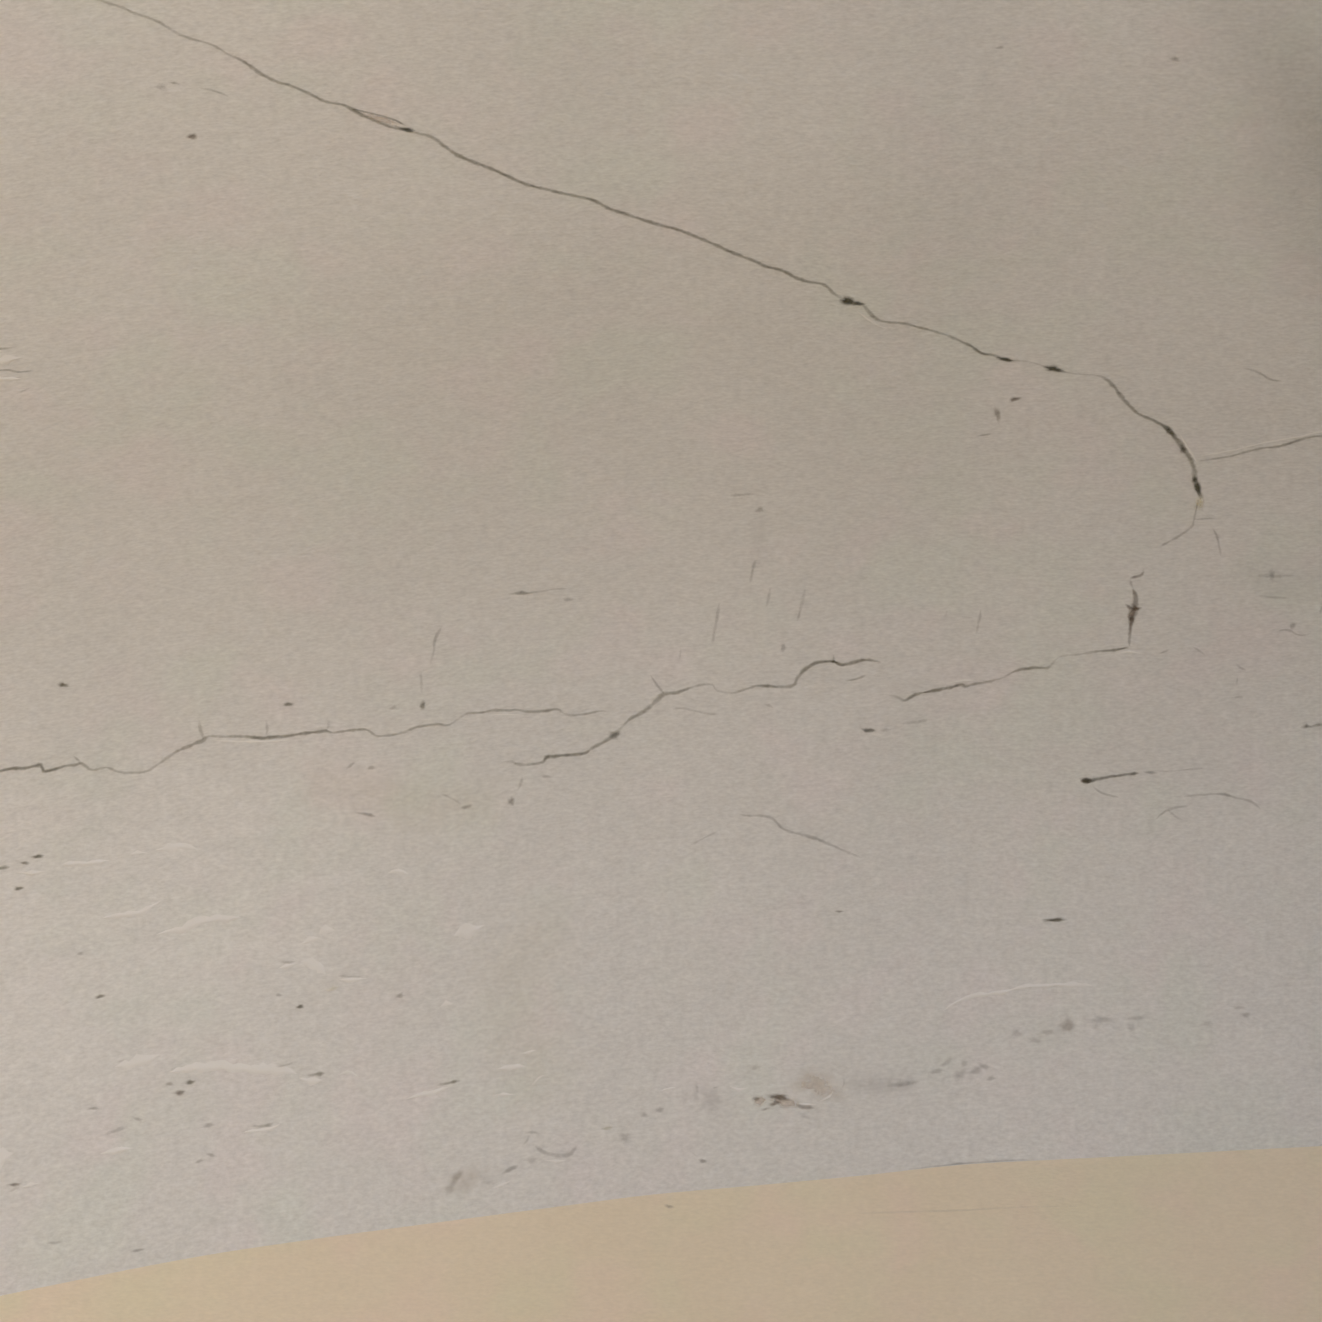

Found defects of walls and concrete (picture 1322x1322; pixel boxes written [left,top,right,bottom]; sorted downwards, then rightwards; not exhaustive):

crack [352,109,411,131]
crack [843,298,889,328]
crack [1158,423,1322,494]
crack [1113,576,1142,654]
crack [912,679,971,697]
crack [215,732,310,743]